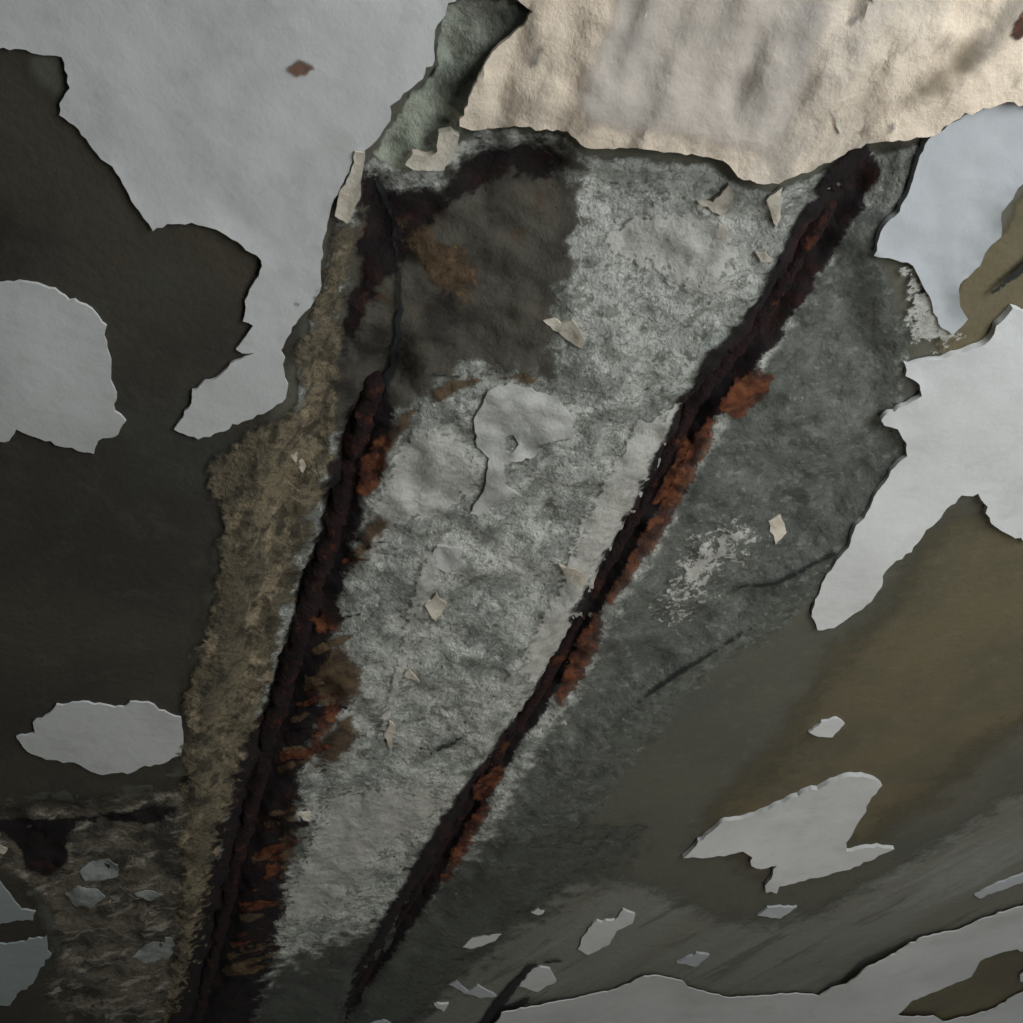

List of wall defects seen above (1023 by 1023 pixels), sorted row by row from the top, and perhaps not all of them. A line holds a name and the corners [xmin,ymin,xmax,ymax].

corrosion [0,805,179,876]
corrosion [159,395,419,1023]
spalling [0,0,831,1006]
leakage [317,131,590,504]
leakage [247,187,962,1023]
corrosion [342,144,882,1023]
leakage [581,0,829,155]
peeling [412,102,1023,1023]
leakage [936,45,977,86]